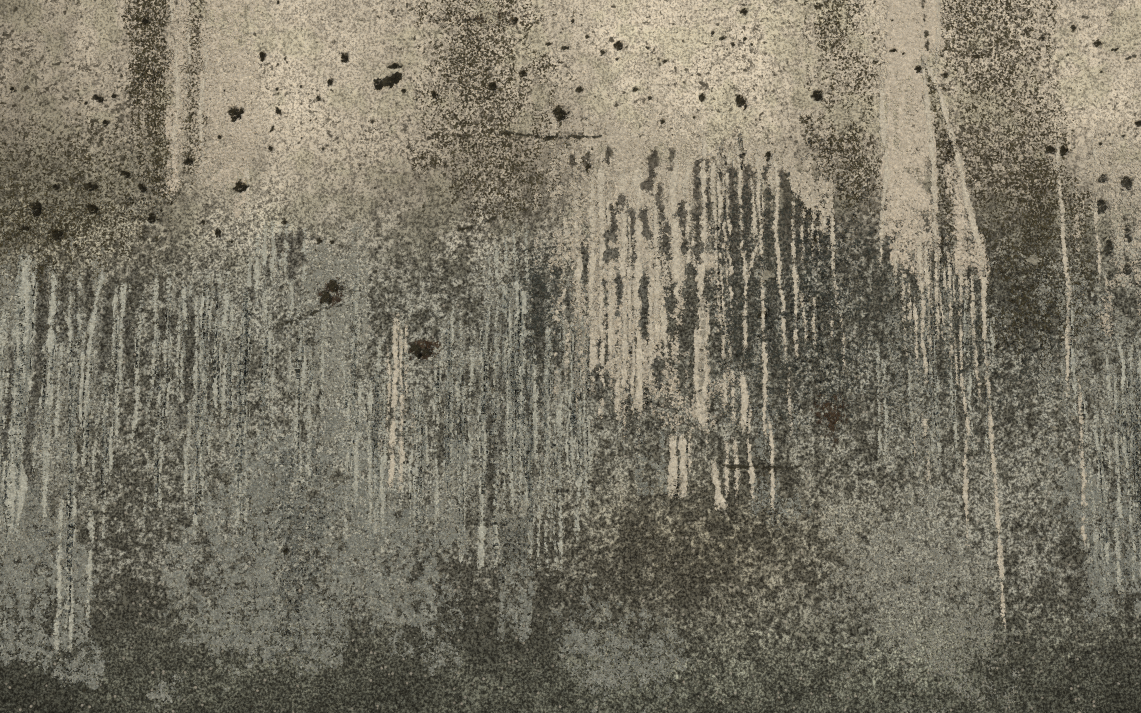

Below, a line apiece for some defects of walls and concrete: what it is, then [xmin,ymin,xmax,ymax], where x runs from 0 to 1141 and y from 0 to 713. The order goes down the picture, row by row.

leakage [0,0,263,654]
leakage [142,0,1141,642]